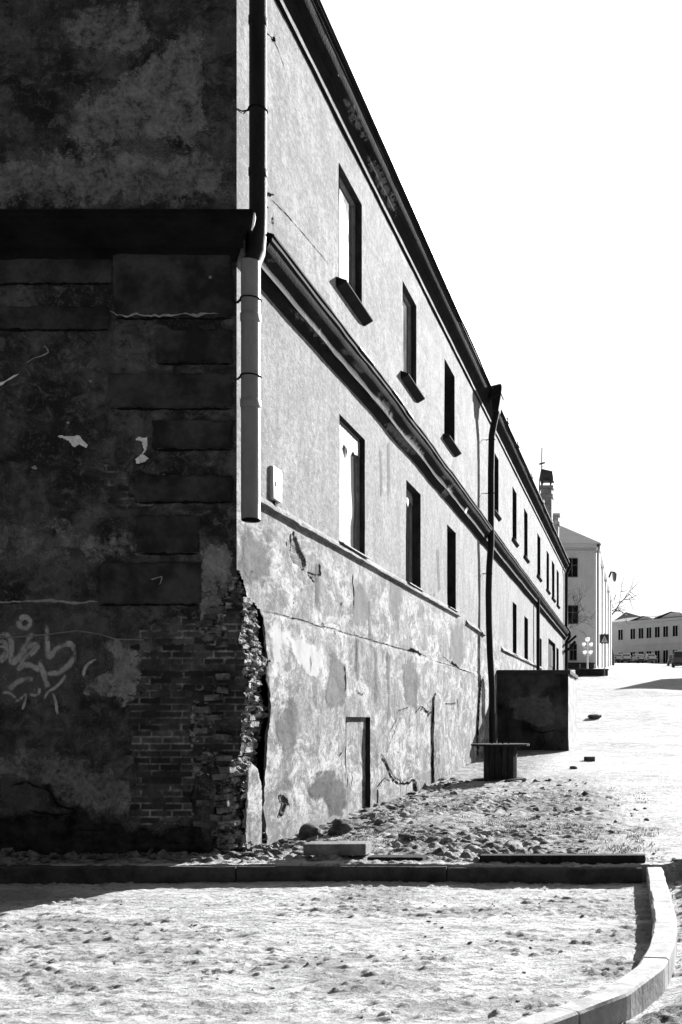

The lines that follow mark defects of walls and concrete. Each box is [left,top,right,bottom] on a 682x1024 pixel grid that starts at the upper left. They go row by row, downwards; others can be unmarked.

spalling [58,421,88,448]
spalling [135,437,149,464]
spalling [286,531,321,582]
spalling [0,544,271,857]
crack [260,609,479,838]
leakage [308,771,348,816]